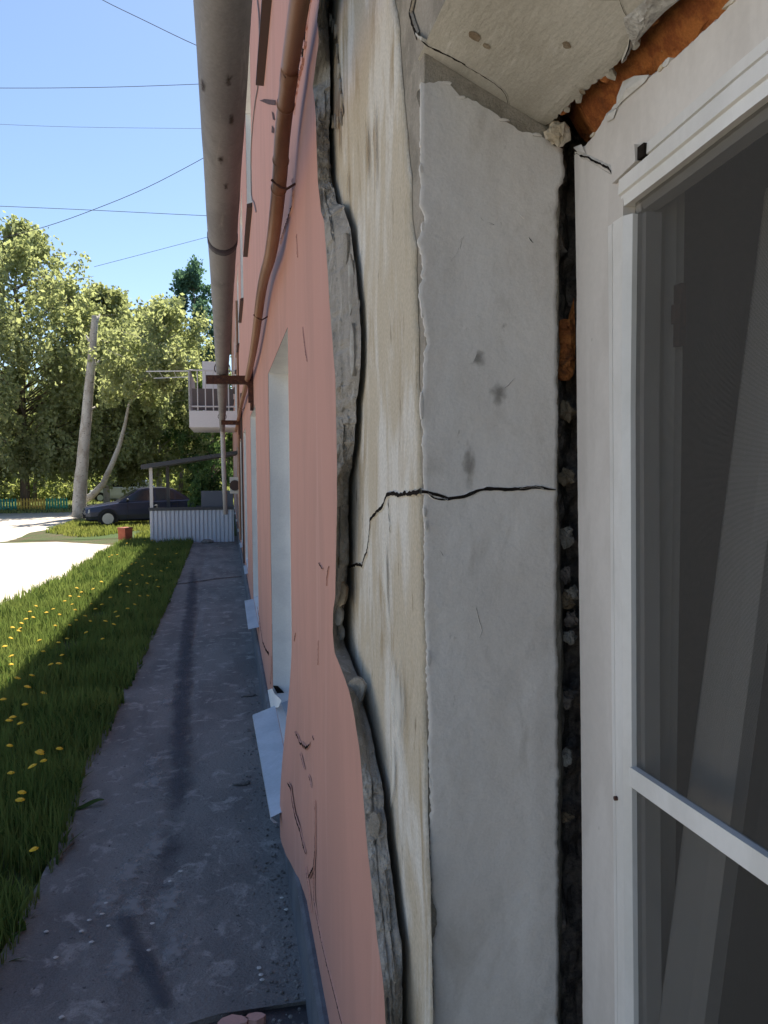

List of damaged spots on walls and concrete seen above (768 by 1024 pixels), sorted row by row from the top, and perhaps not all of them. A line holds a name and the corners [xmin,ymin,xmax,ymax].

flaking render [416,0,736,155]
flaking render [293,0,403,1024]
peeling [419,302,431,858]
crack [318,484,556,586]